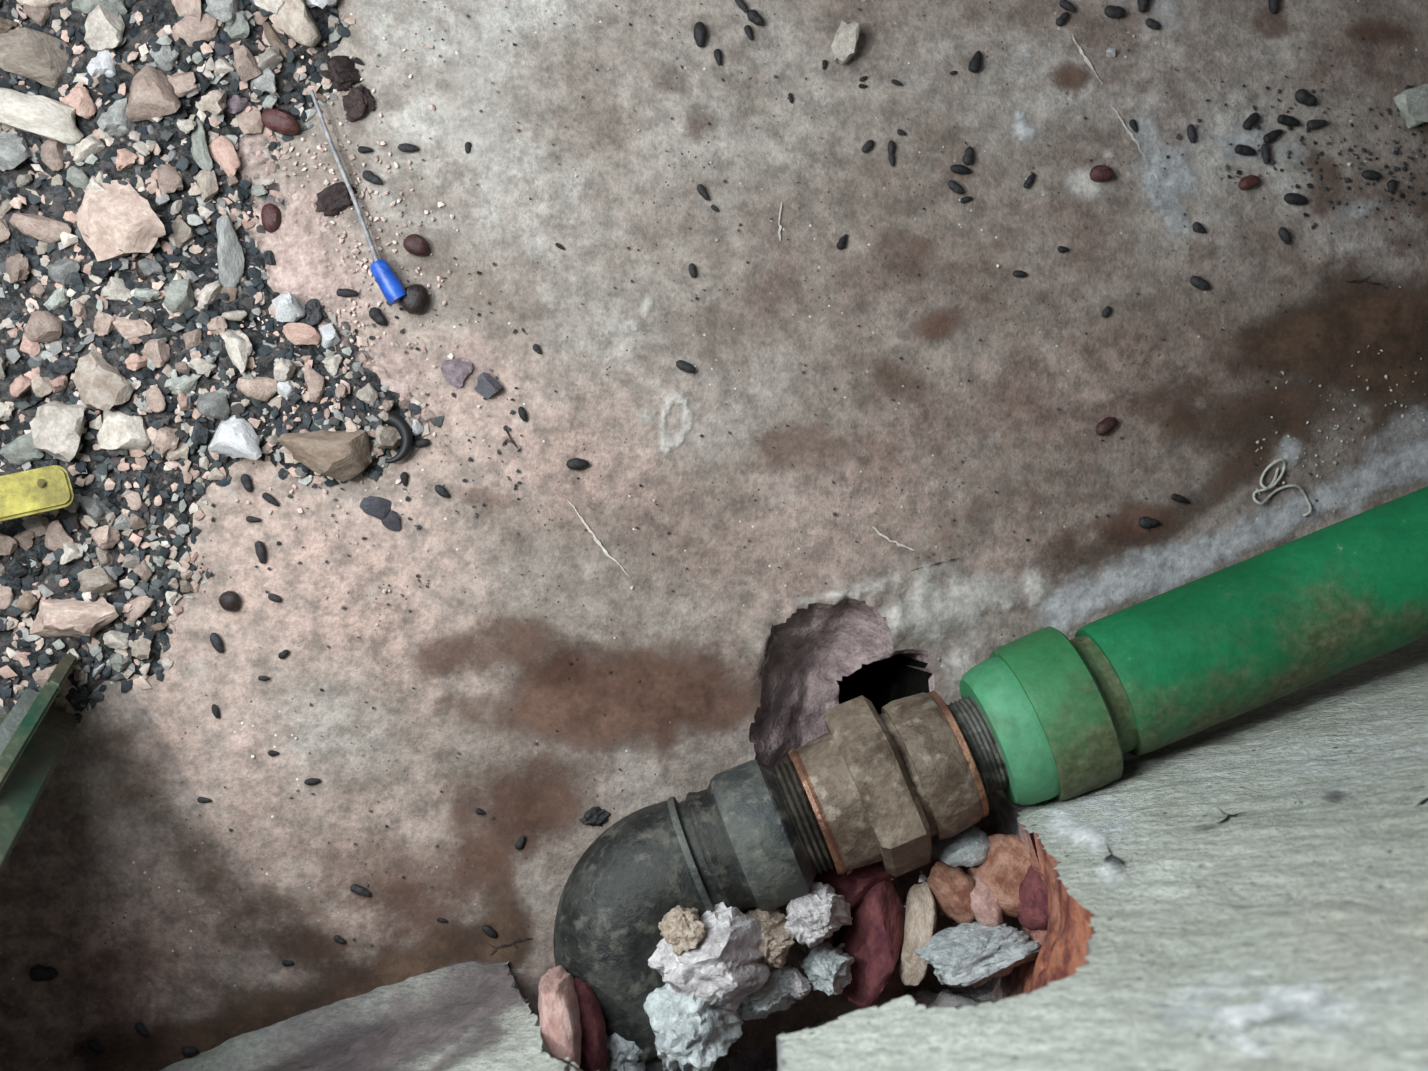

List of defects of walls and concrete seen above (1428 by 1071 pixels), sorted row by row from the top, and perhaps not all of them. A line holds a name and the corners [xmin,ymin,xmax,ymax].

water stain [1137,118,1195,234]
water stain [1221,131,1263,160]
water stain [1040,265,1428,633]
spalling [749,565,1047,768]
spalling [504,964,572,1063]
spalling [726,792,1121,1071]